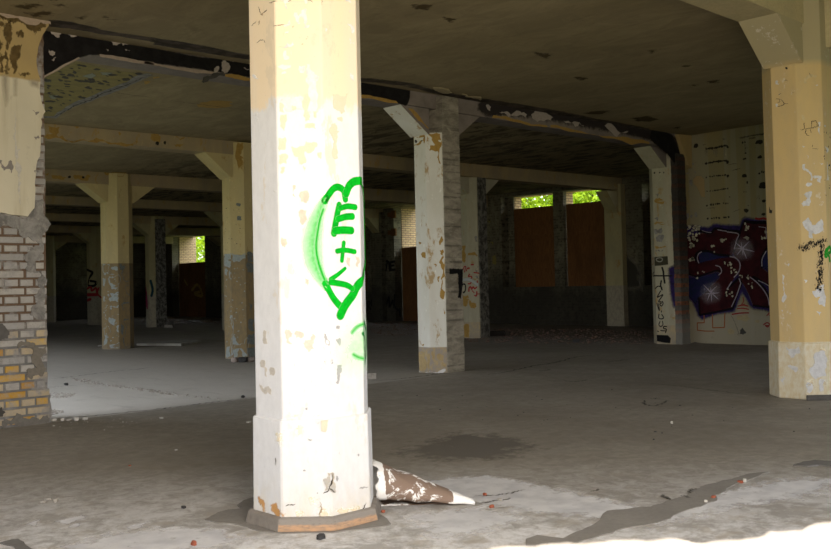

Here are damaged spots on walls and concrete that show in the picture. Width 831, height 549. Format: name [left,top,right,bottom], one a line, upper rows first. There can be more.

peeling [33,41,258,116]
peeling [278,0,322,174]
peeling [329,94,347,159]
peeling [463,94,649,145]
peeling [293,185,309,231]
peeling [434,236,445,299]
peeling [98,264,132,348]
peeling [812,285,826,316]
peeling [285,326,341,352]
peeling [806,350,827,394]
spalling [317,472,339,494]